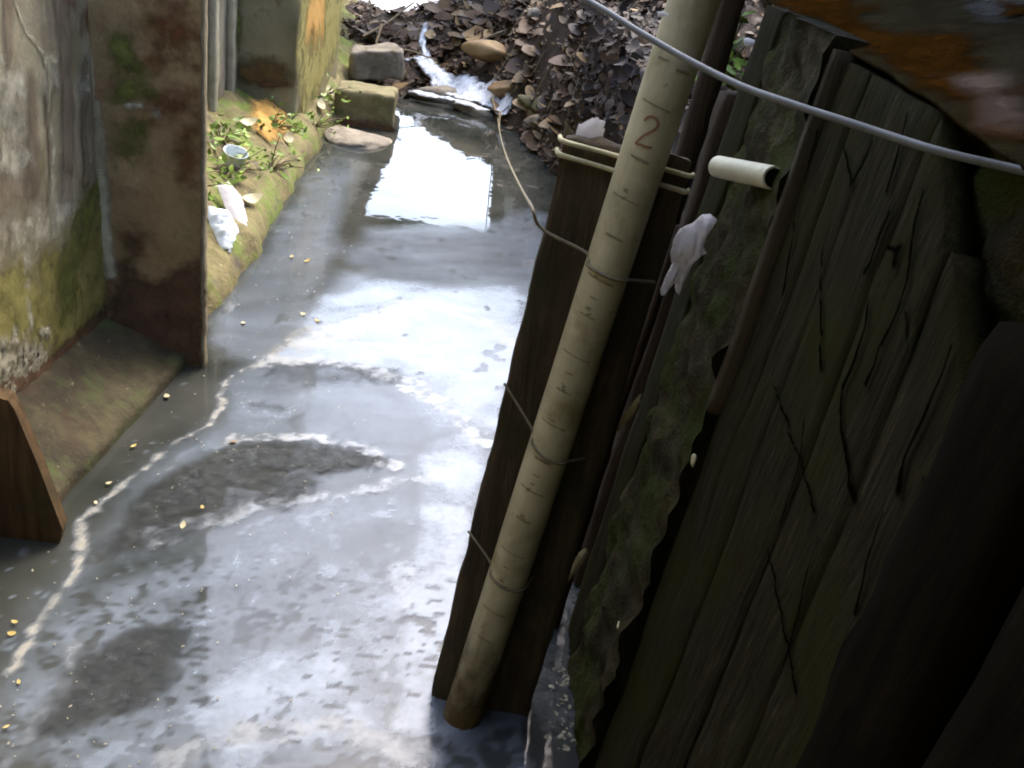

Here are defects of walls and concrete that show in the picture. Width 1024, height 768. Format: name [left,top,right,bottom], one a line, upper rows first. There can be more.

damp [0,0,209,394]
crack [819,112,924,504]
rust [776,0,1024,141]
crack [773,386,815,525]
crack [854,344,952,616]
crack [767,540,818,695]